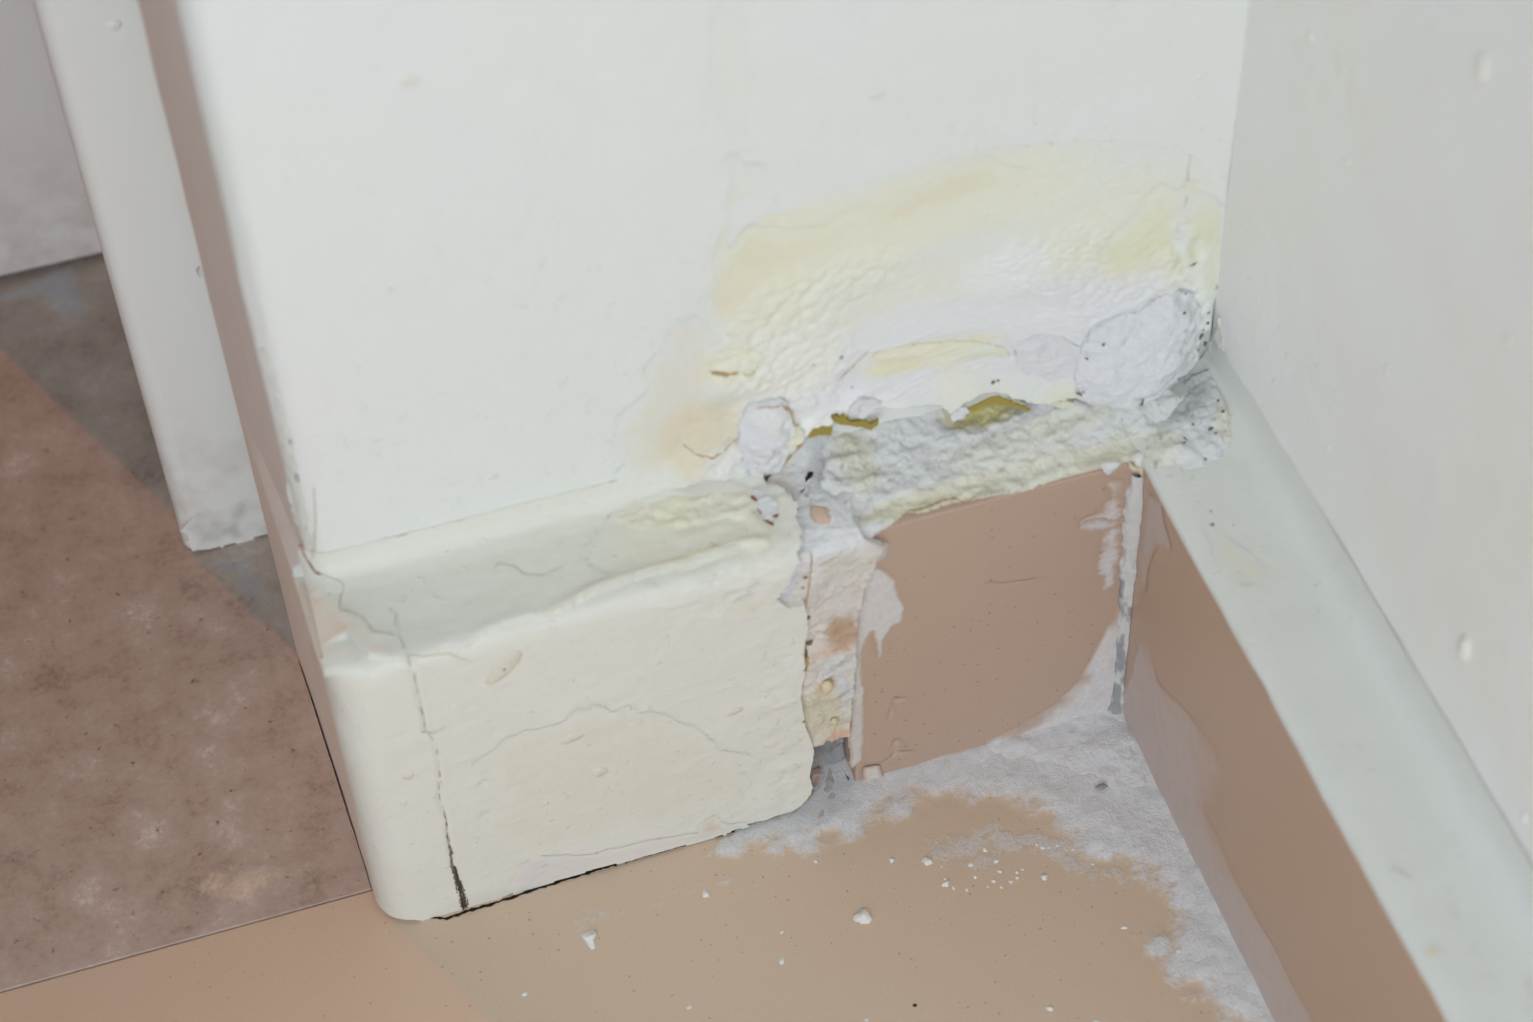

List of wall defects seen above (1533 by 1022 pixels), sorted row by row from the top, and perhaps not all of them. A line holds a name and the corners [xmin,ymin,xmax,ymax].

water stain [578,155,1031,620]
peeling [604,138,1222,747]
water stain [1098,180,1223,312]
water stain [1143,317,1232,475]
crack [294,488,469,910]